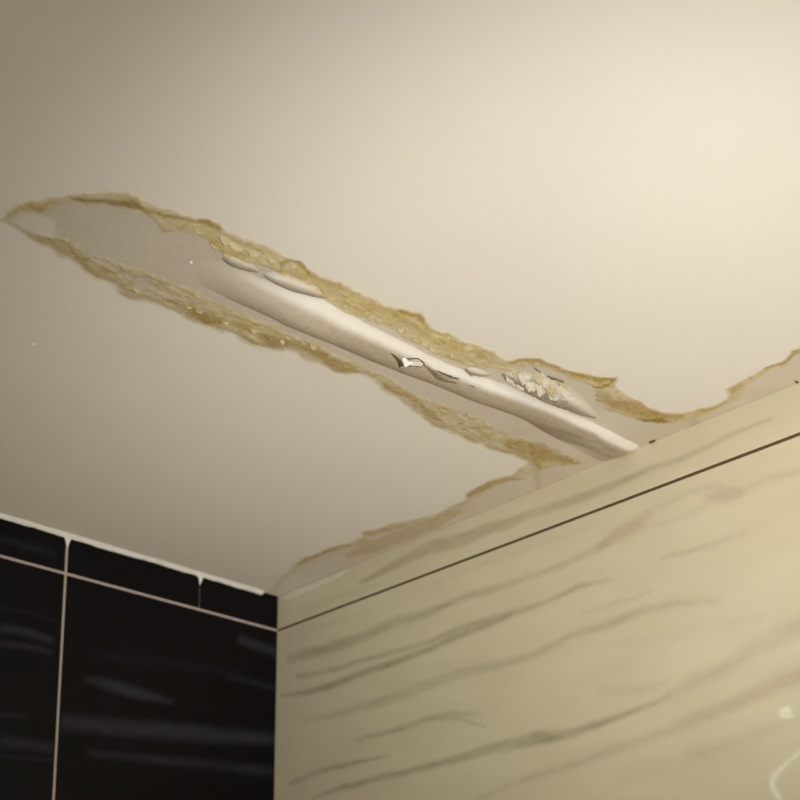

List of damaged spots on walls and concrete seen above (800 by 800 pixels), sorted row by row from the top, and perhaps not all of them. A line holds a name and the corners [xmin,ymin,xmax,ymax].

leakage [0,186,800,596]
peeling [506,367,571,401]